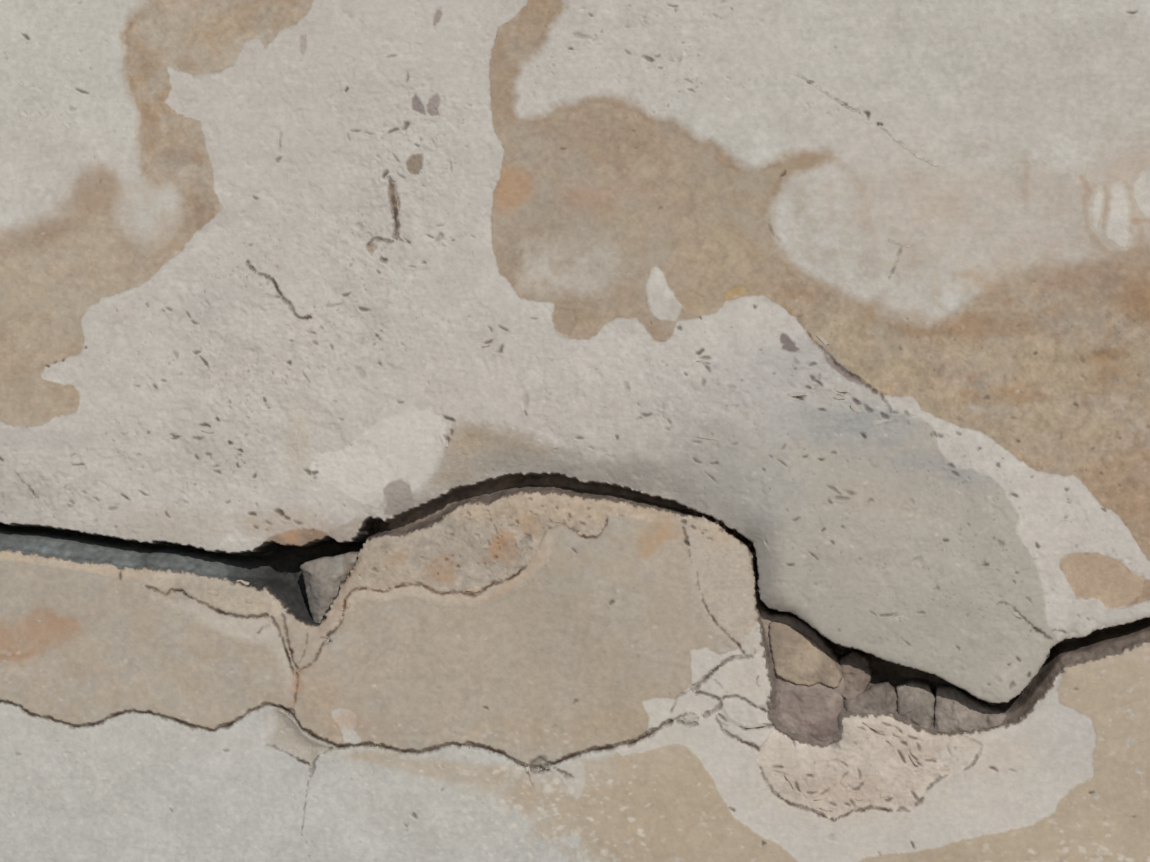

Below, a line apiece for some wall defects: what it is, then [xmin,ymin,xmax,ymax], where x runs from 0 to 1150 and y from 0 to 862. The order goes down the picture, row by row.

damp [0,0,313,427]
flaking render [0,0,1150,641]
damp [490,0,1150,559]
flaking render [0,552,363,777]
crack [0,471,1150,836]
flaking render [612,519,1098,862]